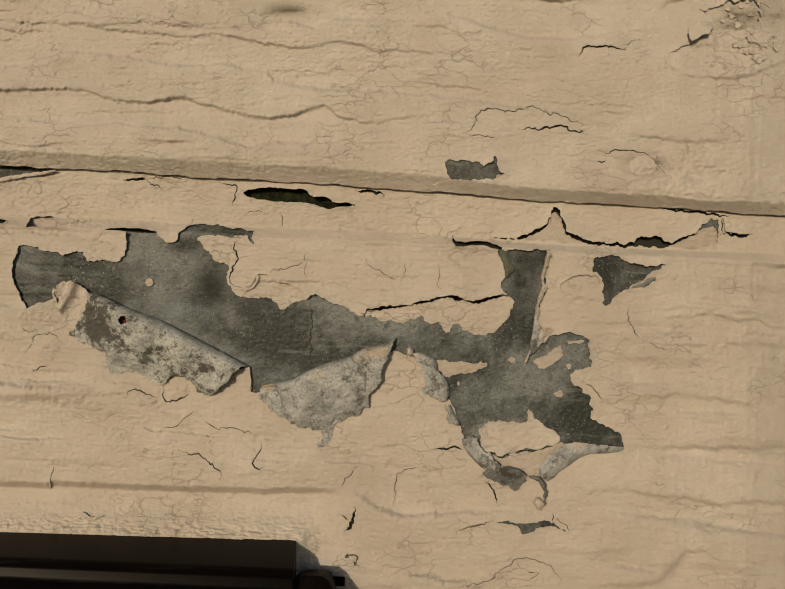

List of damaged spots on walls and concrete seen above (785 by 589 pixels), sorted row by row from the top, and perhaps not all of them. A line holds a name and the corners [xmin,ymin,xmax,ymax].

spalling [668,0,773,55]
crack [454,103,598,140]
peeling [0,166,58,182]
peeling [445,156,504,181]
crack [597,147,667,176]
peeling [12,207,753,510]
crack [341,508,358,532]
crack [461,480,500,532]
peeling [498,520,565,534]